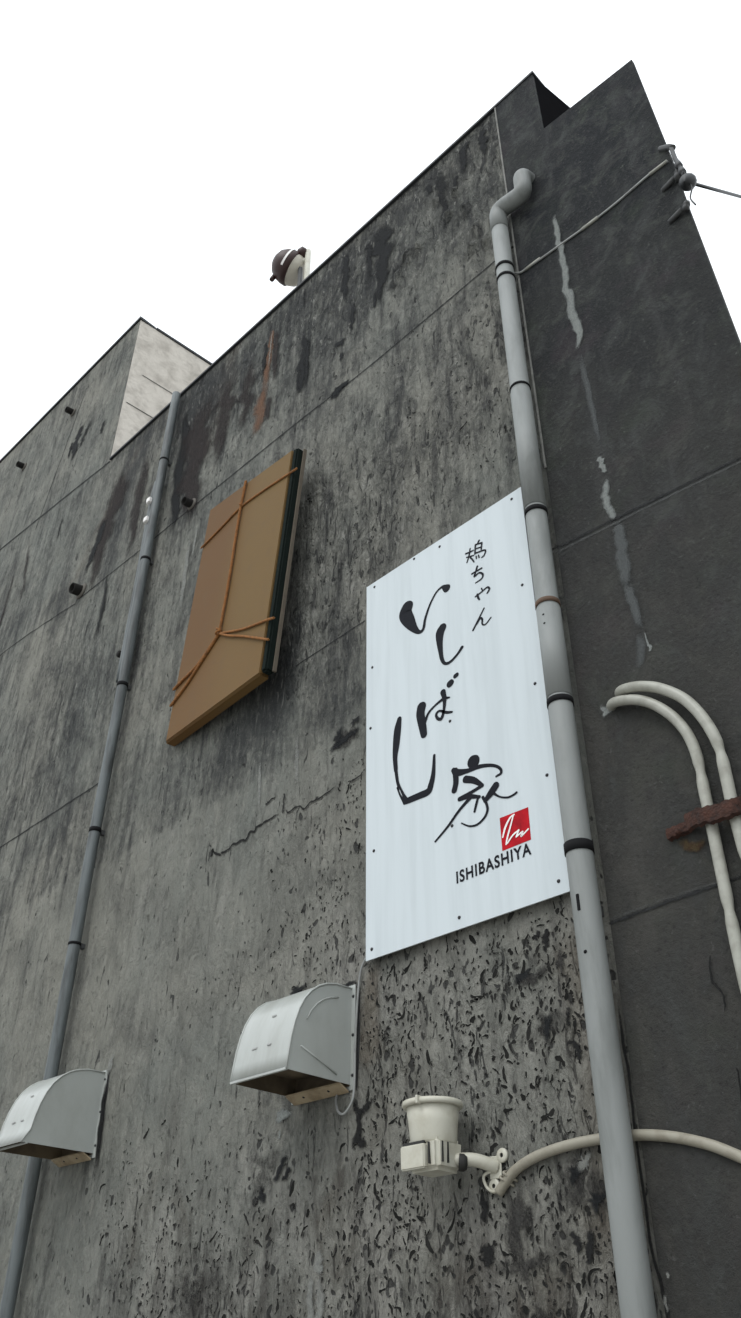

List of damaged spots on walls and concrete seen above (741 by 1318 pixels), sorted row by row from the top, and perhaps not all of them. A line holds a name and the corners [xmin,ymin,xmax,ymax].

water stain [553,219,583,346]
rust [254,331,274,430]
water stain [581,364,599,436]
water stain [85,464,149,637]
water stain [596,456,652,664]
crack [211,772,363,857]